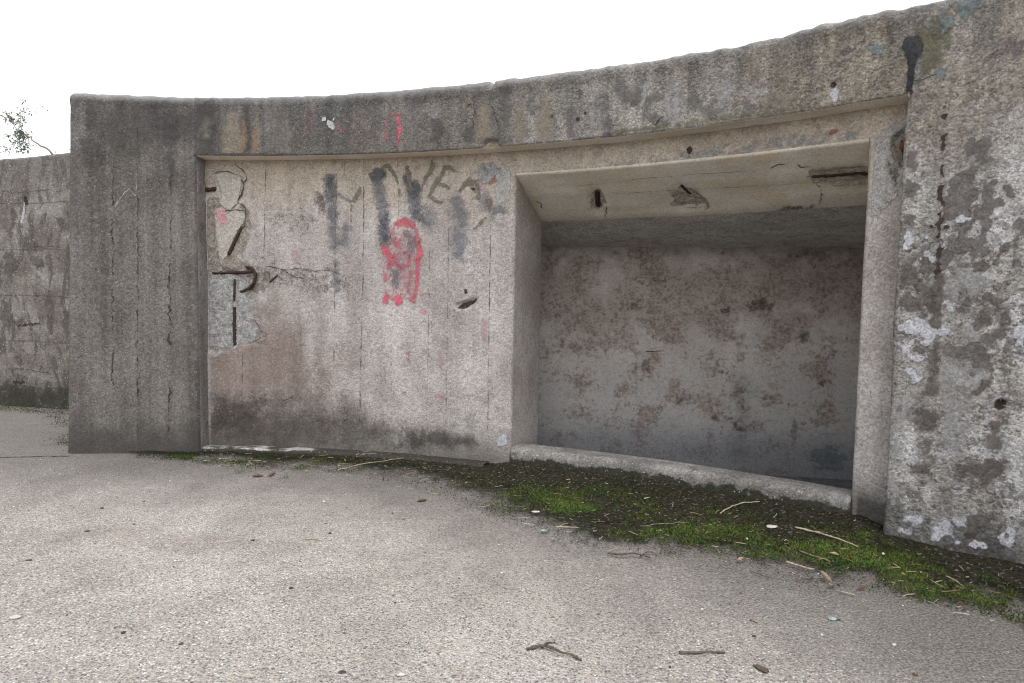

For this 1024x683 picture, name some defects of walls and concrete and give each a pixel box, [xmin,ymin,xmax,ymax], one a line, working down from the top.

spalling [590,190,607,215]
spalling [671,185,709,210]
spalling [809,166,868,186]
crack [929,107,950,279]
spalling [205,172,353,357]
crack [259,257,339,278]
spalling [458,289,477,309]
damp [928,274,944,329]
damp [914,342,941,421]
damp [211,398,475,447]